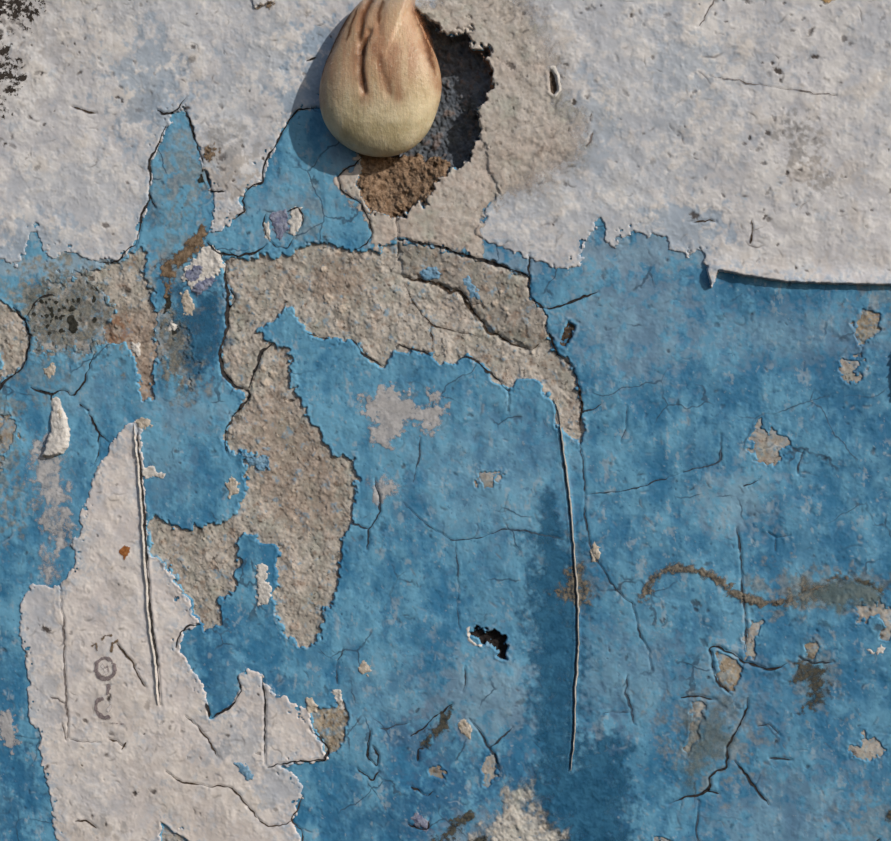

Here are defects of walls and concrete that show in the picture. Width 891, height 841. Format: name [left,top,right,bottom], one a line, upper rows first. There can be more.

water stain [0,0,46,118]
crack [103,99,313,452]
crack [337,158,373,250]
crack [0,294,108,462]
peeling [0,0,588,841]
crack [116,425,200,705]
crack [51,592,126,749]
crack [166,771,304,841]
crack [189,677,329,767]
crack [669,528,831,841]